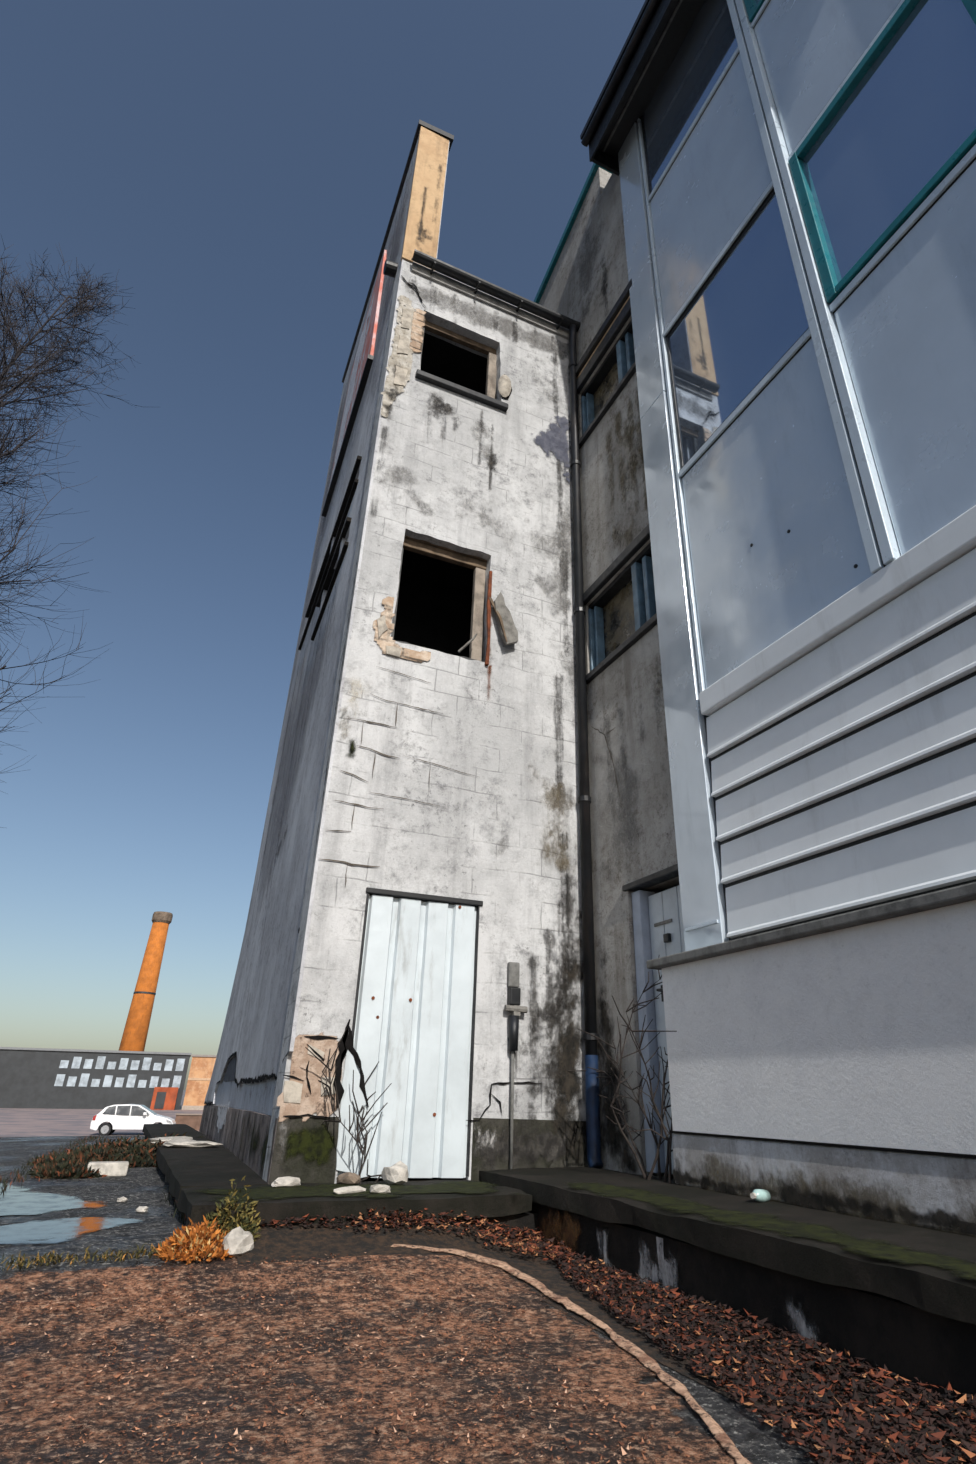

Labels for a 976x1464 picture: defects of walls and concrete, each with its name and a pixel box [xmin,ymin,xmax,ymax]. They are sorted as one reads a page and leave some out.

spalling [381,295,426,417]
damp [606,392,647,510]
damp [541,462,574,612]
spalling [373,596,431,662]
damp [546,649,576,814]
damp [475,830,636,1173]
spalling [223,1055,237,1082]
crack [204,1019,351,1119]
spalling [277,1033,342,1122]
damp [676,1155,976,1237]